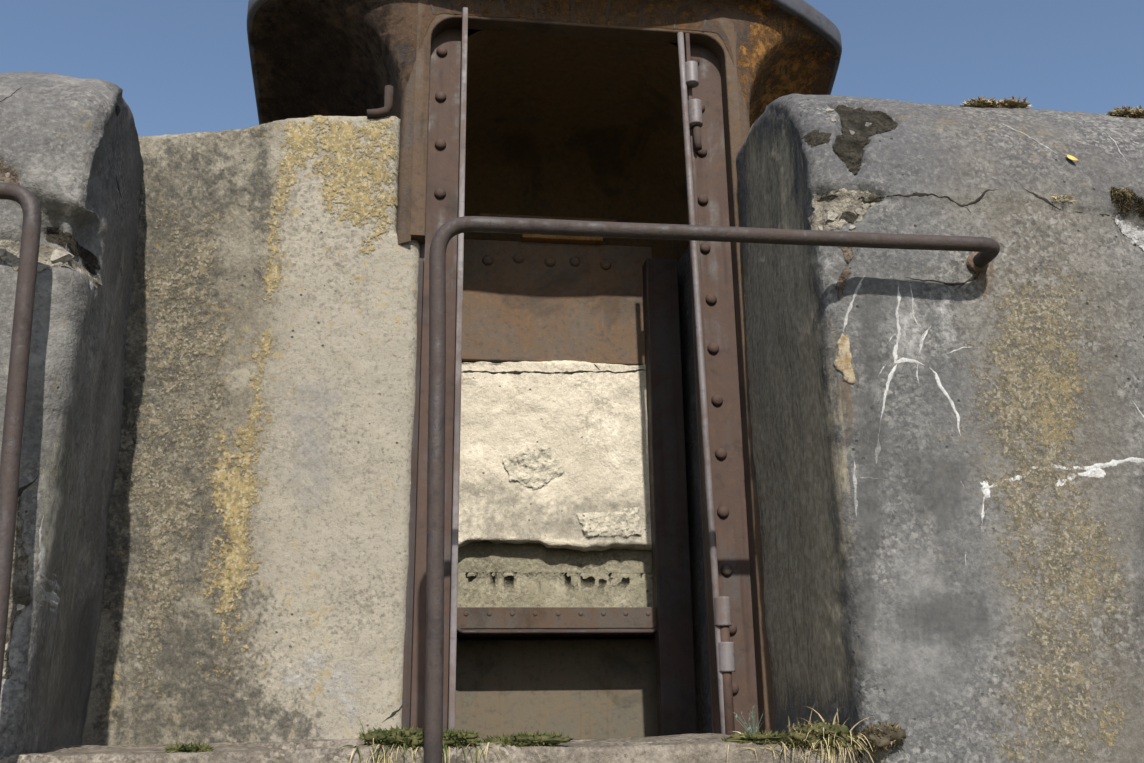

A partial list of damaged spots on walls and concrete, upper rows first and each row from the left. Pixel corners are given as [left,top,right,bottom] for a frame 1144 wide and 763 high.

rust [249,0,405,122]
rust [736,0,838,128]
spalling [801,105,898,174]
spalling [37,227,102,288]
spalling [799,188,893,232]
crack [893,188,1110,216]
spalling [1113,215,1144,250]
crack [462,364,646,375]
crack [860,273,980,480]
crack [960,457,1144,529]
damp [94,378,138,730]
damp [196,412,275,682]